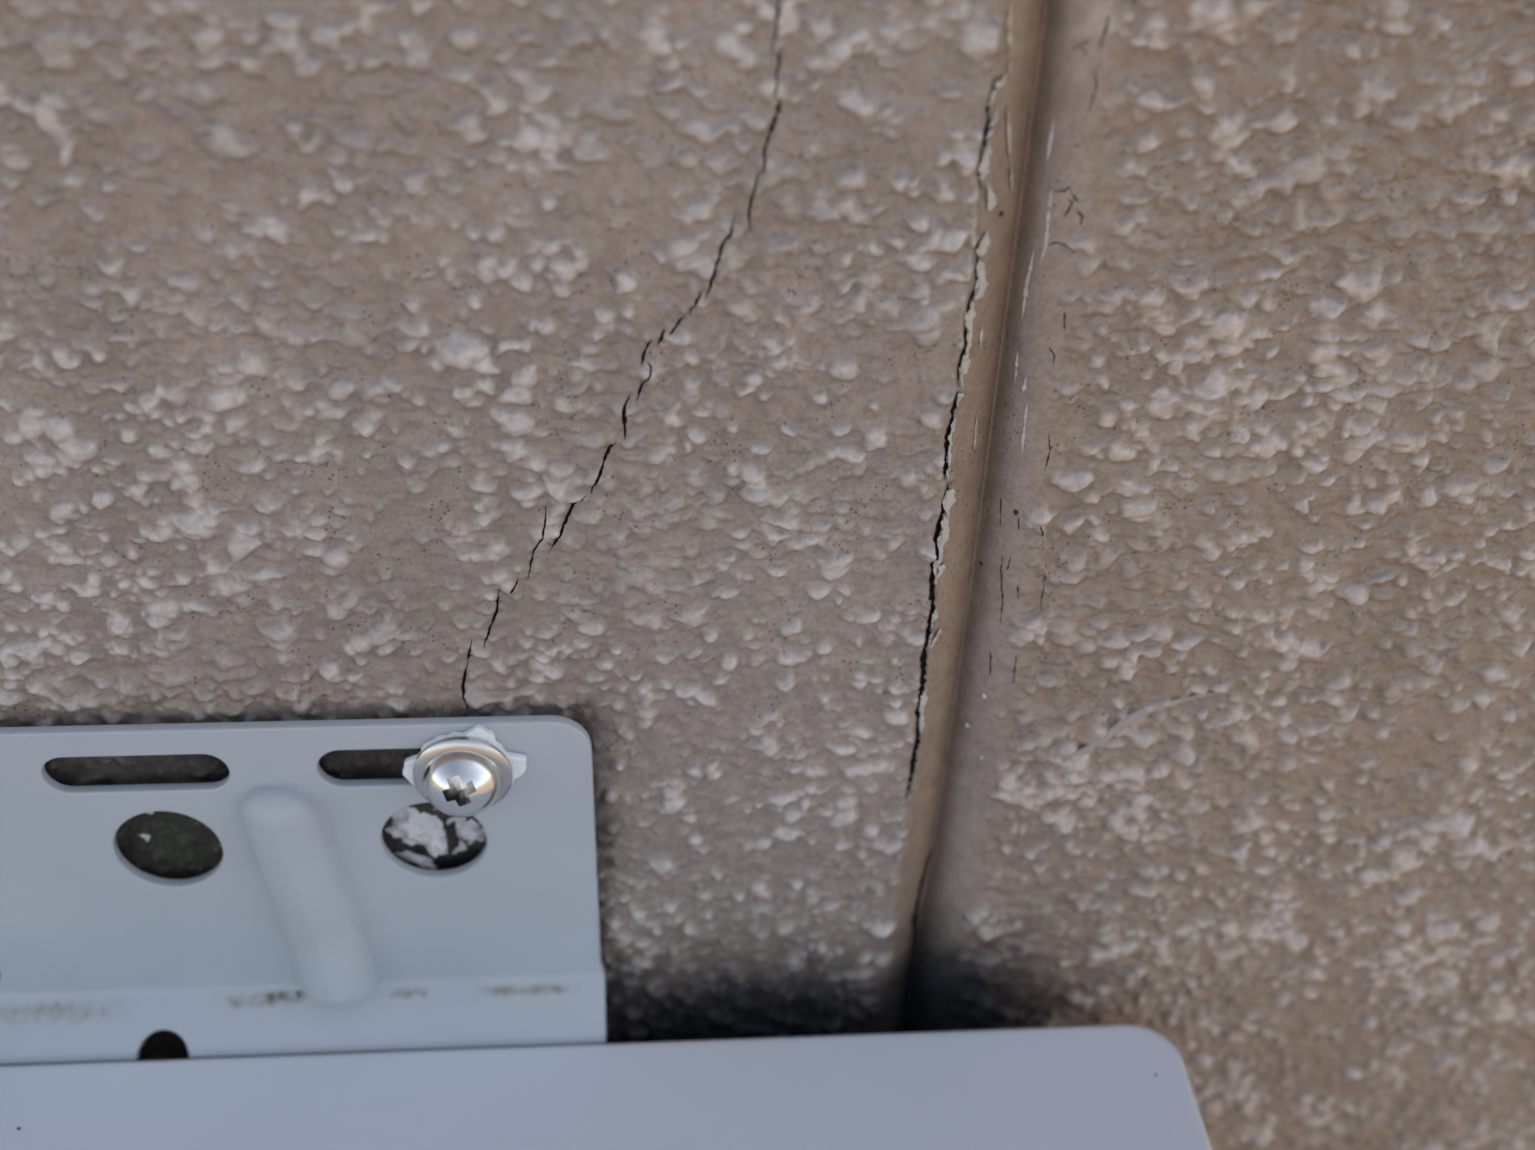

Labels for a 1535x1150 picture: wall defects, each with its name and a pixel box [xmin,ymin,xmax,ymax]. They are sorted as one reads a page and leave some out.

crack [1048,186,1084,254]
crack [461,0,781,710]
crack [905,74,1007,799]
crack [1049,313,1066,364]
crack [989,497,1046,681]